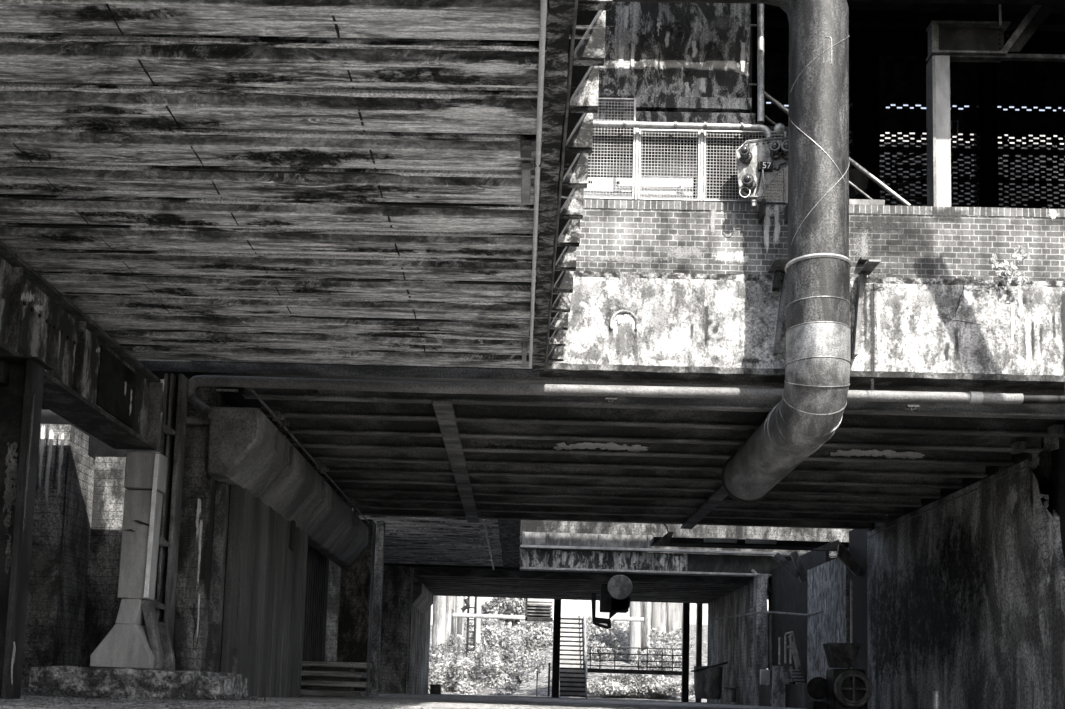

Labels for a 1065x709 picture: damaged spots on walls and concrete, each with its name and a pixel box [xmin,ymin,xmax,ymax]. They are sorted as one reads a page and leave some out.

water stain [618,43,635,73]
water stain [684,78,707,94]
water stain [1011,277,1065,365]
water stain [944,327,959,360]